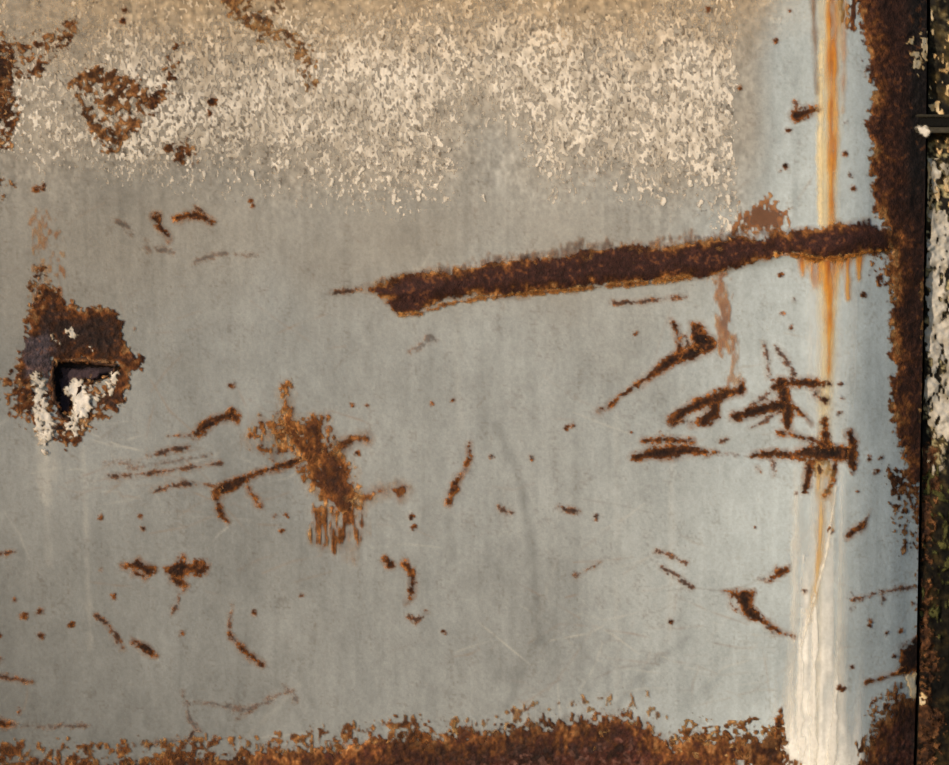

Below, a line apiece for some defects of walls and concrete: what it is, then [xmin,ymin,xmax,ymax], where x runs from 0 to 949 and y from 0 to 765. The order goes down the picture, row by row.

corrosion [0,20,78,150]
corrosion [67,42,184,154]
corrosion [12,277,145,451]
corrosion [247,380,406,554]
corrosion [355,0,946,765]
corrosion [0,691,802,765]